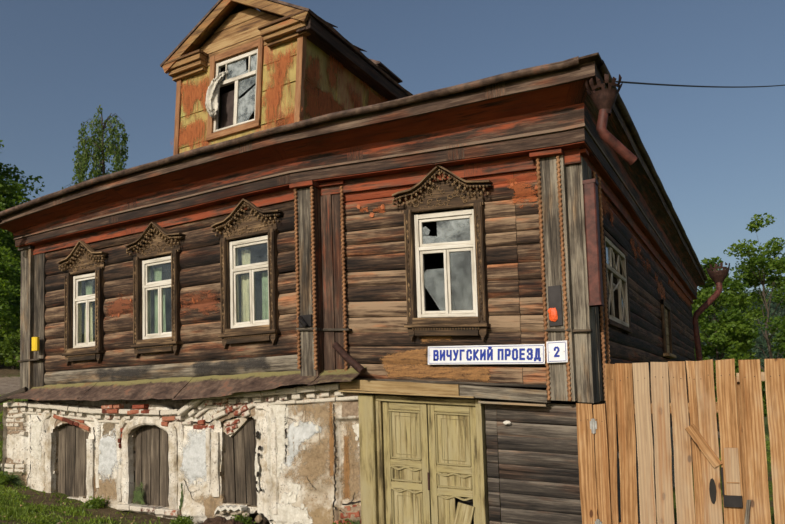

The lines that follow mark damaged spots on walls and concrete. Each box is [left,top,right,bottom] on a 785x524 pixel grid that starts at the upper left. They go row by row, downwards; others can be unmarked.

flaking render [1,406,43,476]
flaking render [53,404,152,480]
flaking render [179,398,256,486]
flaking render [253,400,321,524]
flaking render [342,392,359,446]
spalling [333,505,361,524]